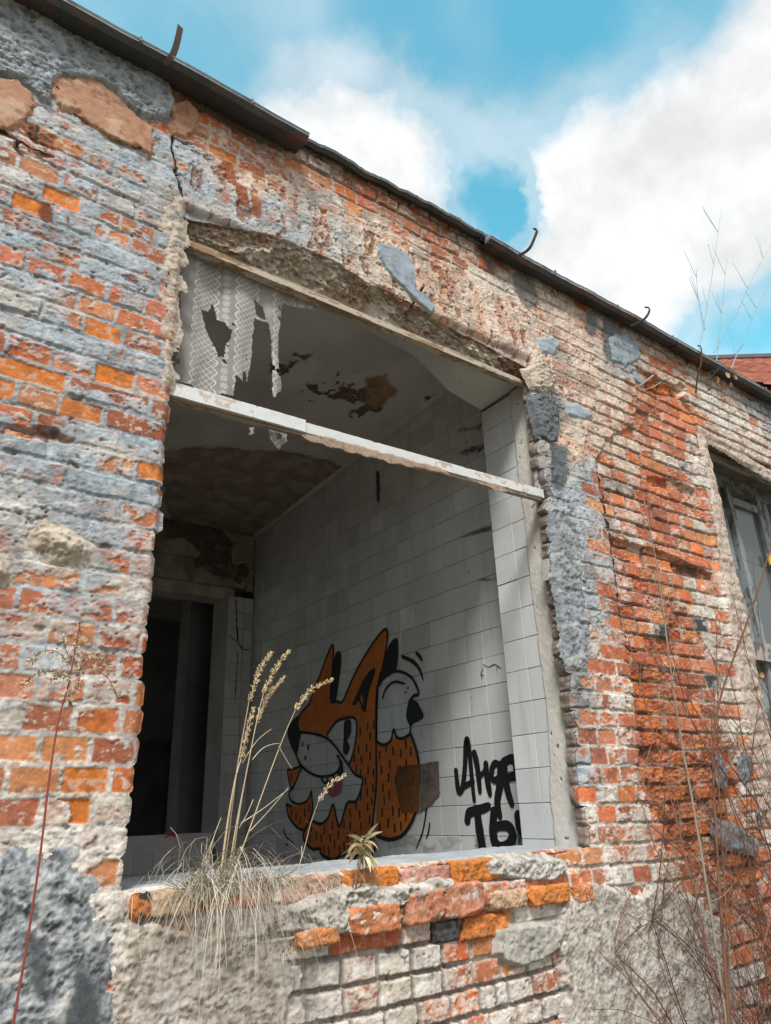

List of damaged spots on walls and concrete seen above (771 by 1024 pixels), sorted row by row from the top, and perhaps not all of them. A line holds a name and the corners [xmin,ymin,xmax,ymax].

flaking render [0,0,201,160]
crack [74,113,192,197]
flaking render [377,244,434,316]
flaking render [608,333,687,400]
flaking render [564,402,593,420]
peeling [302,434,449,474]
flaking render [163,518,249,584]
spalling [128,856,594,950]